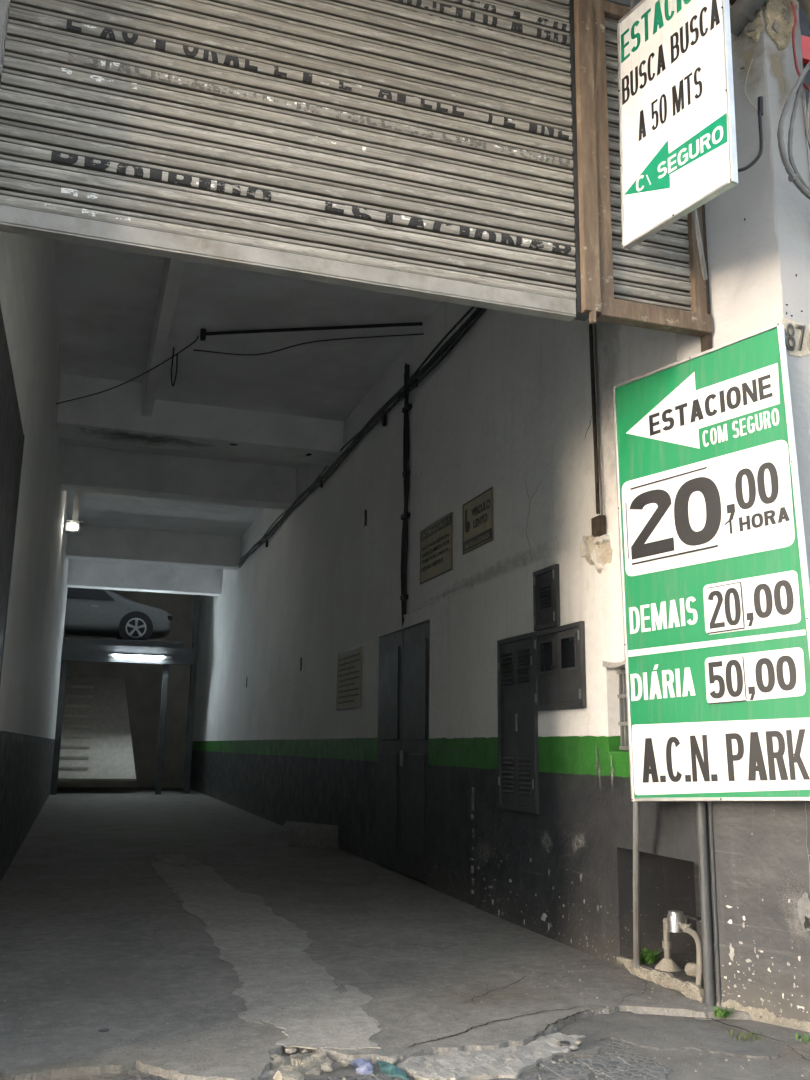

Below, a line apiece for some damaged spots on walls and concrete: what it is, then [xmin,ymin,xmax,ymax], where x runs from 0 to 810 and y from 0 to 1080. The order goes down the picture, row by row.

spalling [742,0,799,50]
spalling [580,535,612,574]
spalling [788,892,810,937]
crack [409,976,587,1047]
spalling [604,941,810,1032]
crack [685,1017,810,1061]